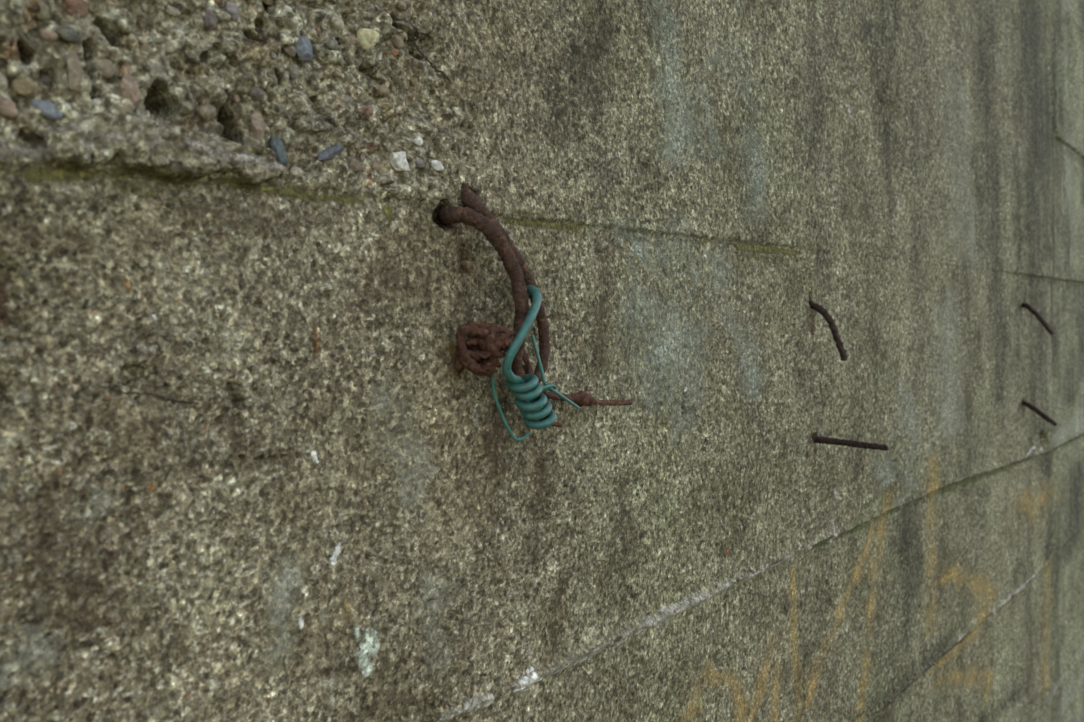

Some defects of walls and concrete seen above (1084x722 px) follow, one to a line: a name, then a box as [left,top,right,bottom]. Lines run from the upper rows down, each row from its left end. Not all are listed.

spalling [0,0,469,193]